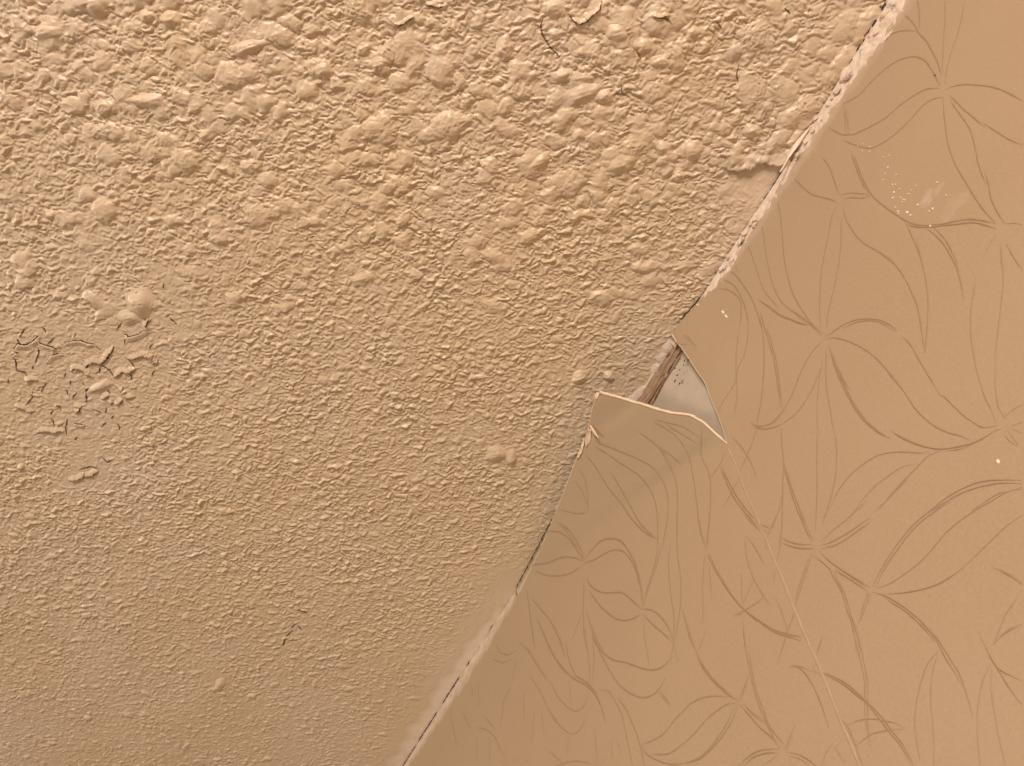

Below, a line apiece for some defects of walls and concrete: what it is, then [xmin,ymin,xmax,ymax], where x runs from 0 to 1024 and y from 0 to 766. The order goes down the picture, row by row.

flaking render [696,0,905,306]
crack [0,317,177,440]
peeling [628,337,677,401]
crack [68,459,110,481]